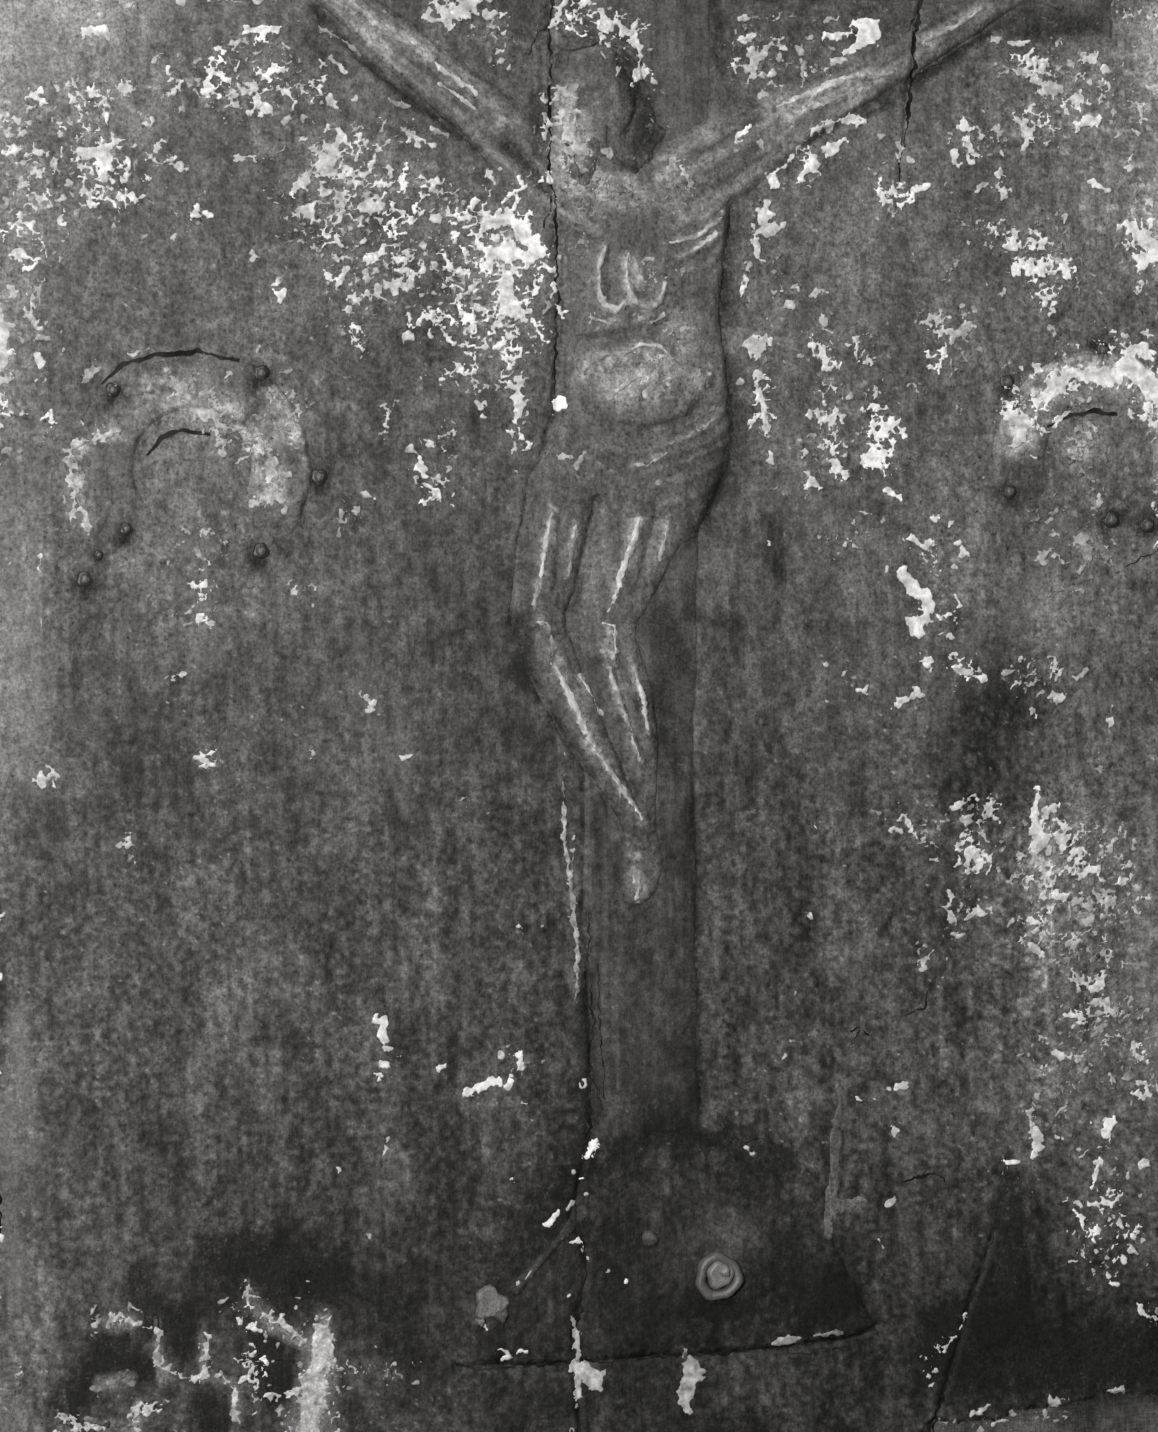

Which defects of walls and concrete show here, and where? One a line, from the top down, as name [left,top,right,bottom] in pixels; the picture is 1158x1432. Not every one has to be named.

crack [898,0,978,189]
peeling [0,0,724,539]
crack [528,0,561,394]
peeling [724,0,1158,605]
peeling [855,1081,909,1101]
peeling [874,785,1158,1288]
peeling [53,1369,170,1432]
peeling [90,1279,421,1432]
peeling [497,1348,528,1362]
peeling [920,1312,967,1387]
crack [922,1230,994,1432]
peeling [1136,1302,1158,1326]